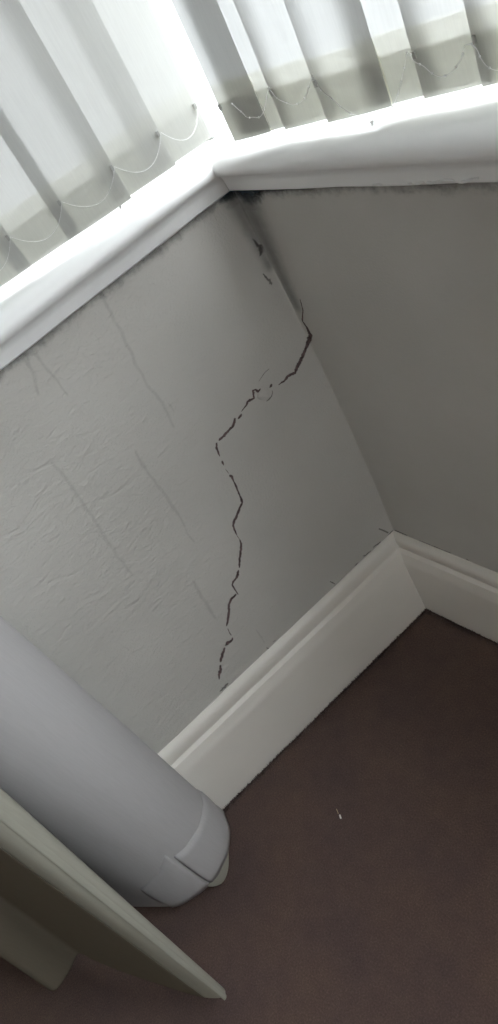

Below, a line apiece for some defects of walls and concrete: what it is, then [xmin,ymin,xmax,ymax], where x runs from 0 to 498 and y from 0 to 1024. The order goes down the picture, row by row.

crack [215,300,312,679]